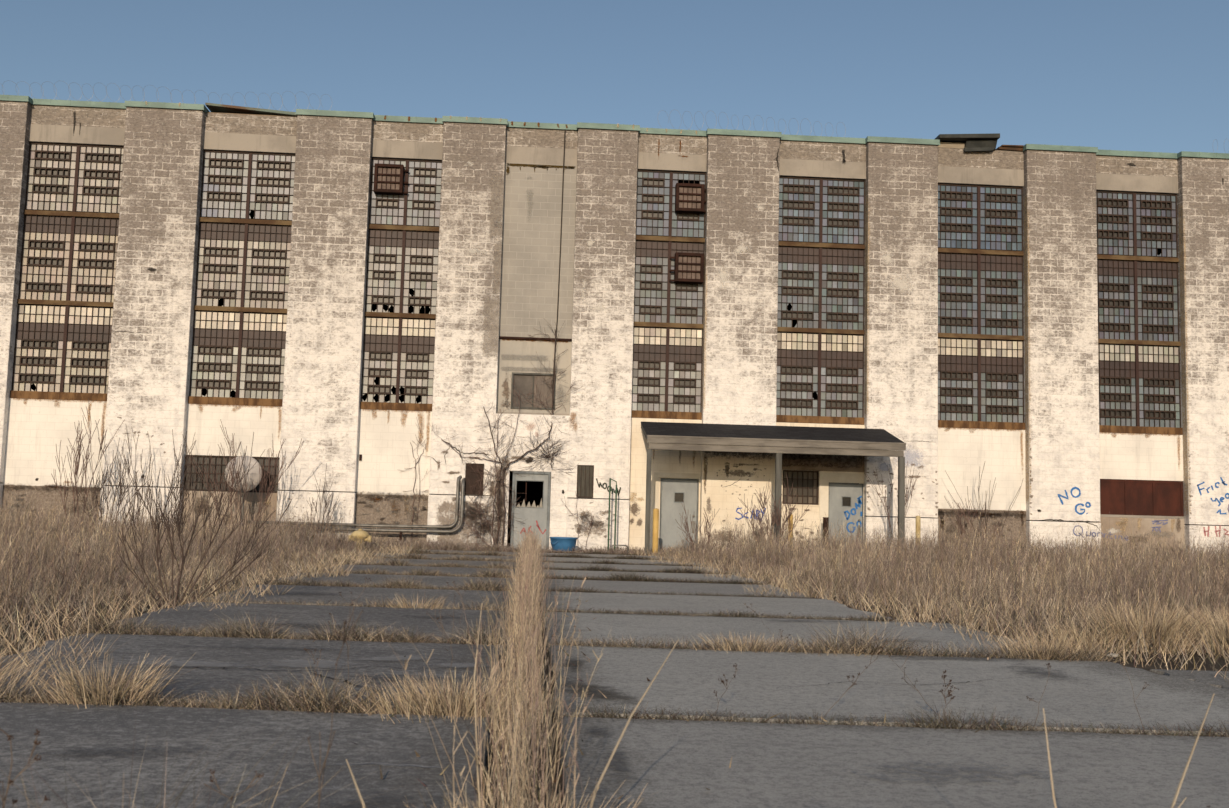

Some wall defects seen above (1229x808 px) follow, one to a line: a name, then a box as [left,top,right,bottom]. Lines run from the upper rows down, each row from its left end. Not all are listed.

corrosion [1102,206,1190,514]